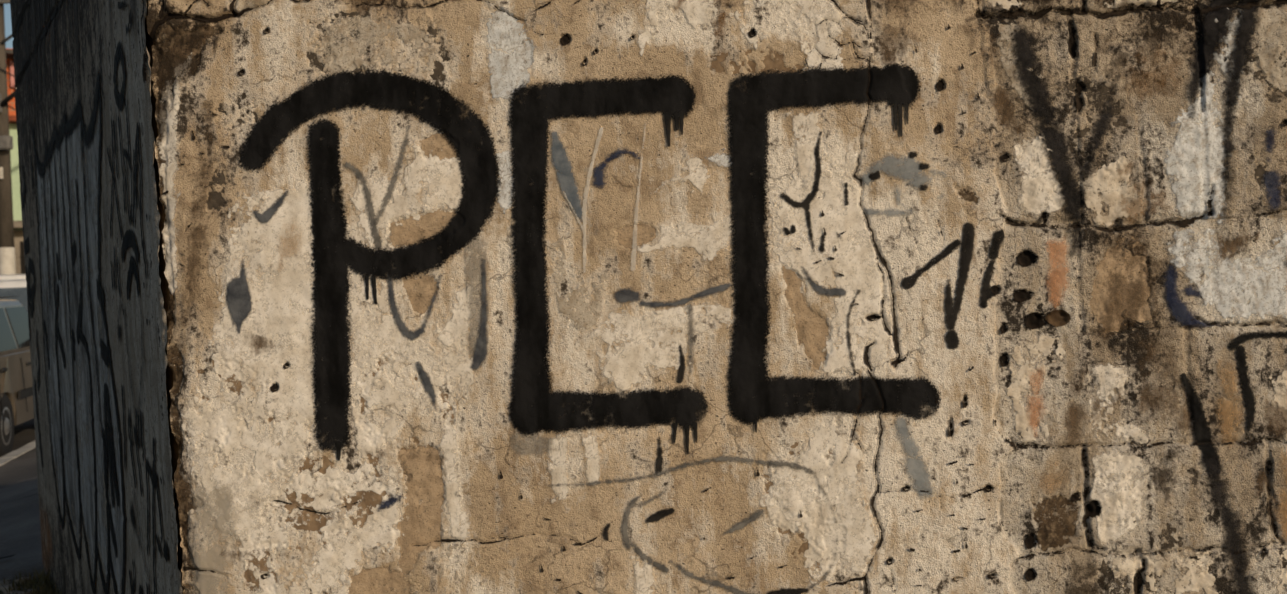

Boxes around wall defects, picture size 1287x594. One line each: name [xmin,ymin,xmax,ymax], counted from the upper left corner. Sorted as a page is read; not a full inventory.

crack [357,0,580,35]
peeling [988,0,1043,110]
peeling [1092,0,1177,8]
peeling [1000,136,1065,224]
peeling [1057,70,1149,228]
peeling [1164,6,1287,324]
crack [805,0,984,594]
spalling [1017,251,1038,267]
flaking render [1090,236,1152,333]
peeling [992,286,1071,450]
peeling [1269,371,1287,417]
peeling [1025,363,1237,594]